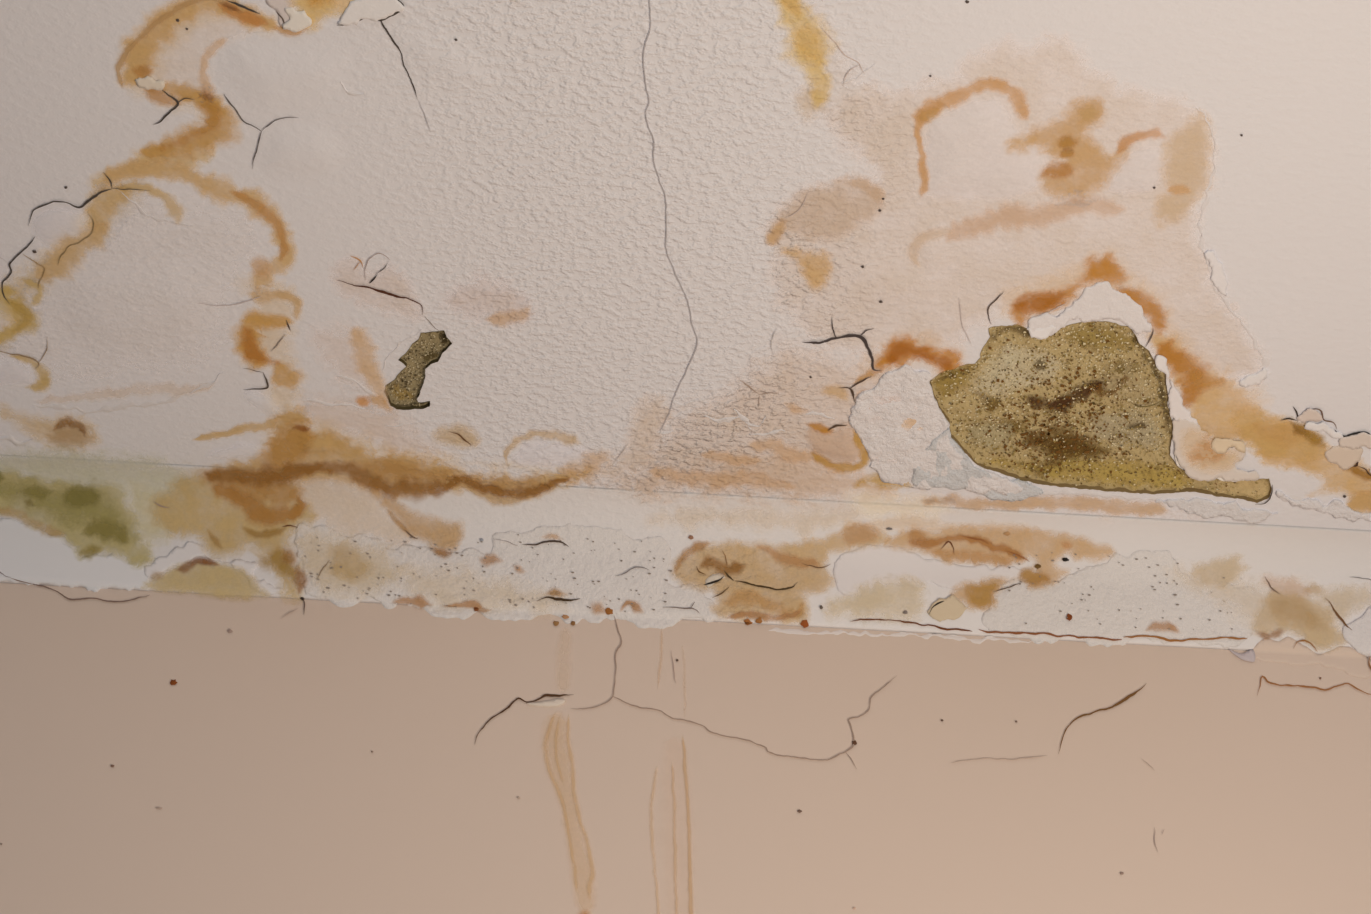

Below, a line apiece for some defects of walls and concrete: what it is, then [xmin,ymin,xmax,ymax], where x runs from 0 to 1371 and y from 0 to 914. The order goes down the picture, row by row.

peeling [265,0,312,32]
peeling [338,0,405,26]
crack [0,172,150,303]
water stain [0,0,353,385]
crack [338,253,439,331]
water stain [768,0,1256,375]
spalling [385,330,452,410]
crack [771,322,880,431]
spalling [849,281,1371,522]
water stain [0,355,876,599]
water stain [676,518,1113,623]
crack [475,616,895,766]